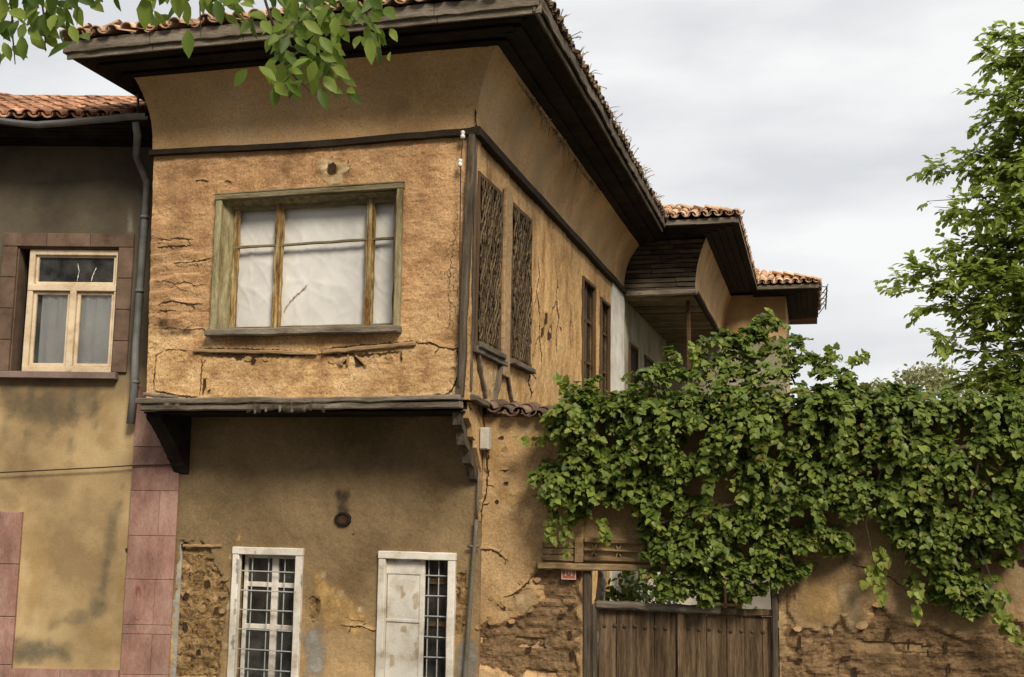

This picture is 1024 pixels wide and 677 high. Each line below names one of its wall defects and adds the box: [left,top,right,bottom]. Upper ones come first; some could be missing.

spalling [319,159,352,186]
crack [153,233,213,398]
spalling [193,340,416,366]
crack [528,255,572,403]
crack [478,467,494,521]
leakage [17,642,65,660]
spalling [175,541,239,677]
spalling [455,569,582,677]
spalling [771,585,1024,677]